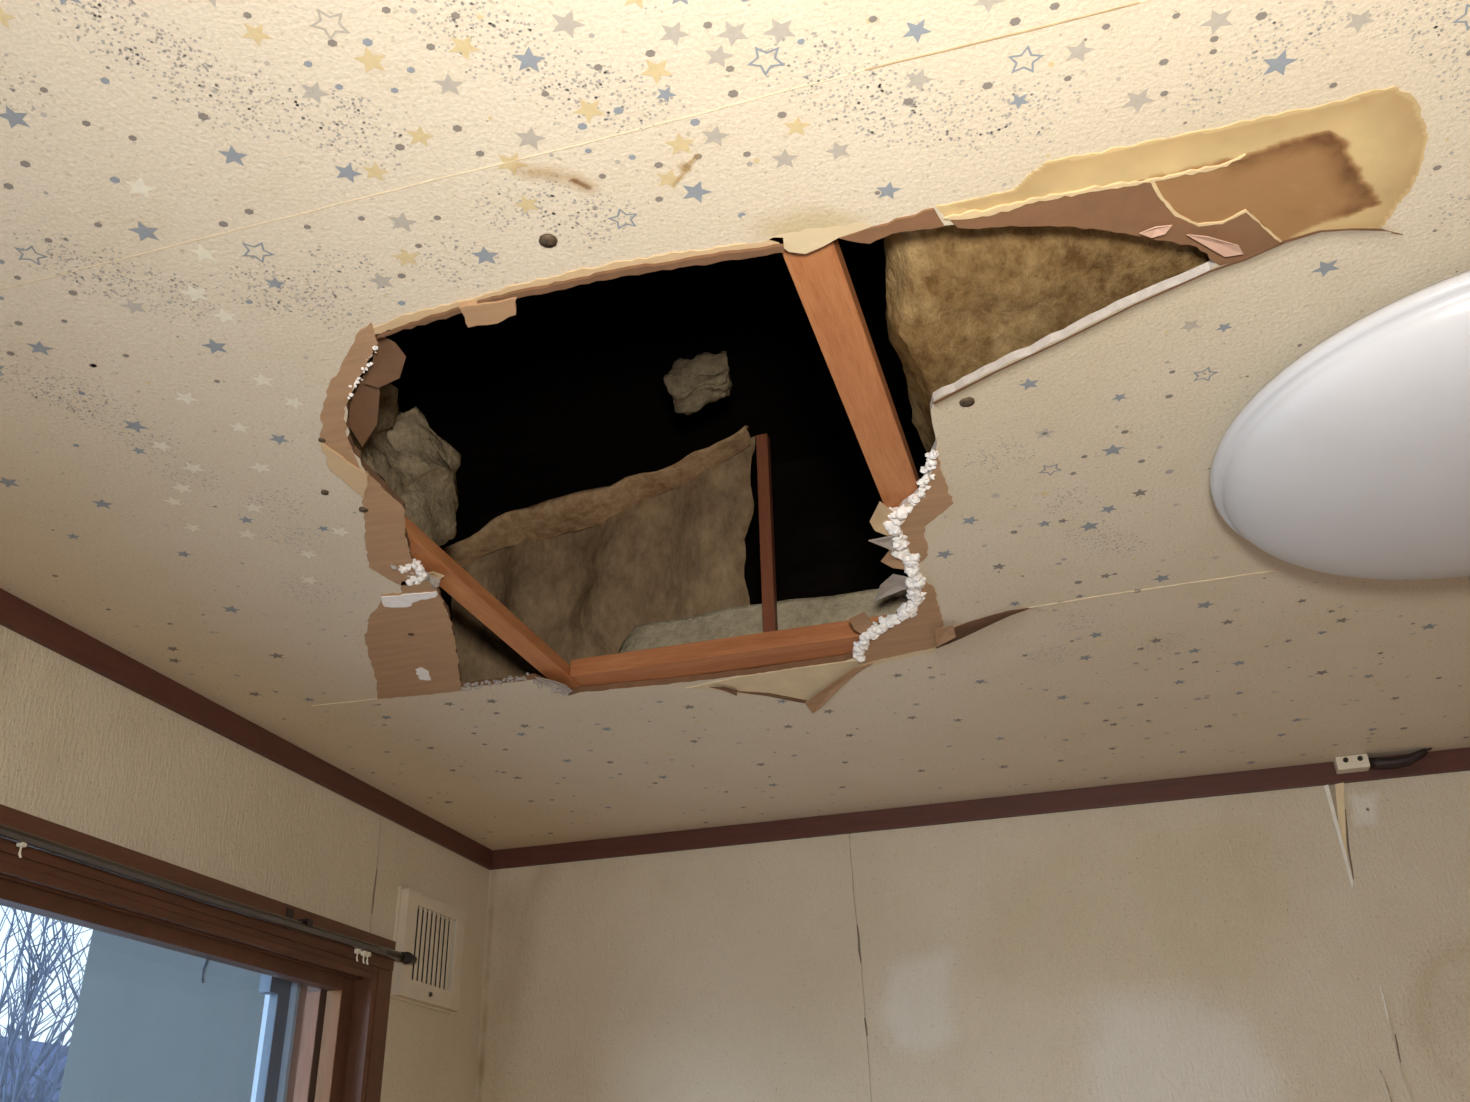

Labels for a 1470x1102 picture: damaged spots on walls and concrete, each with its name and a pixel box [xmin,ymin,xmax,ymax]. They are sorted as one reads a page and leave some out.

peeling [320,86,1428,713]
crack [1379,985,1413,1102]